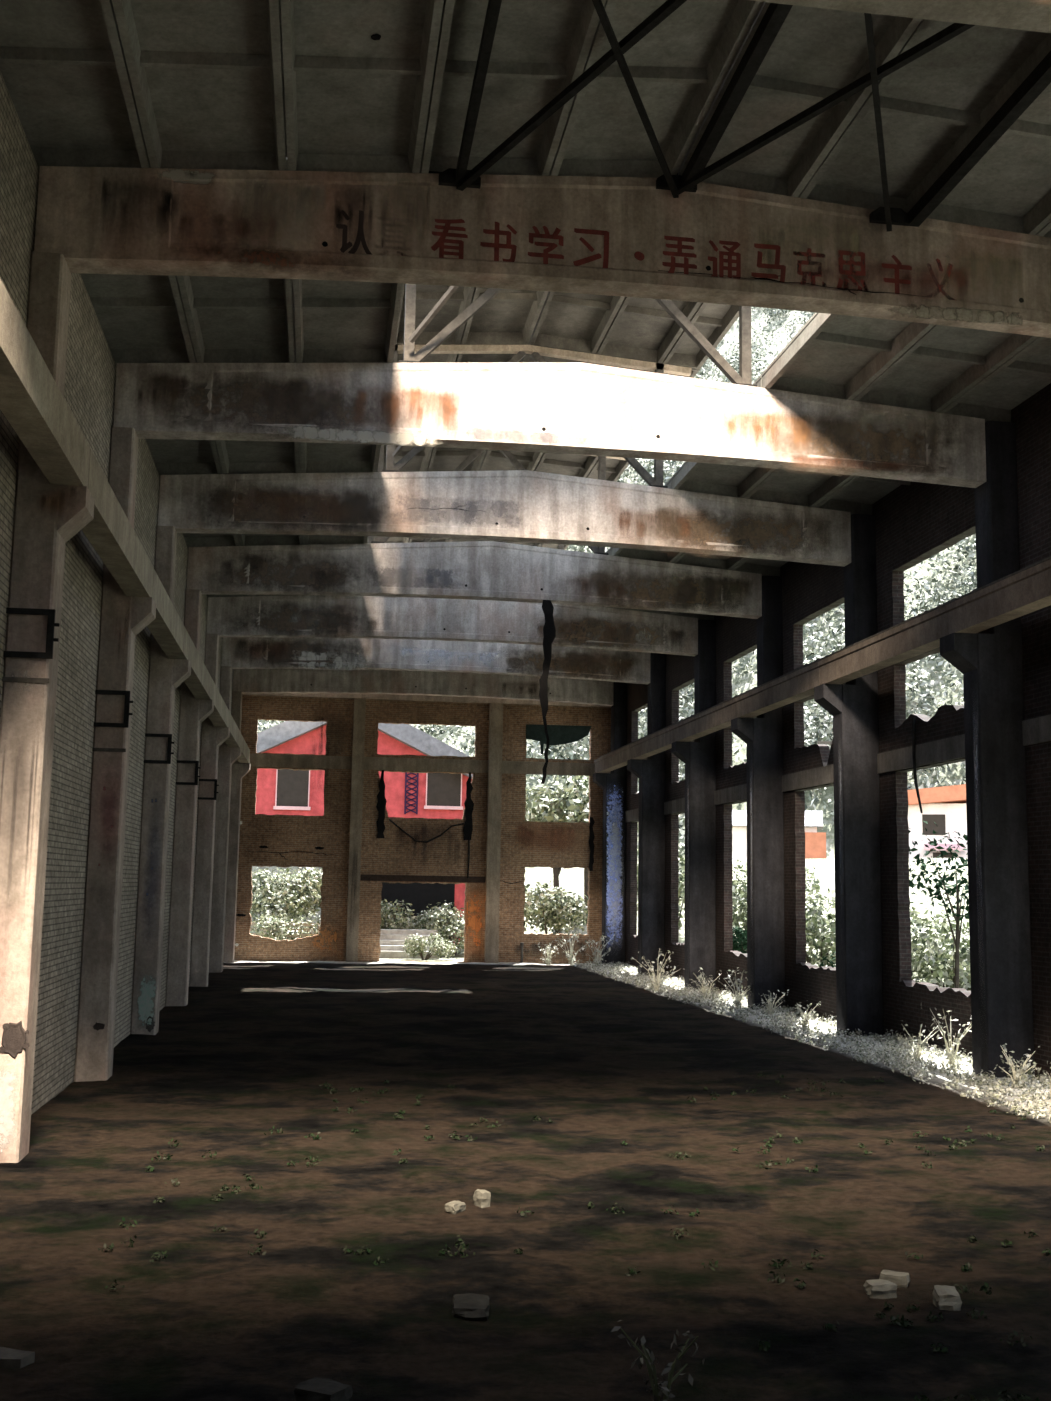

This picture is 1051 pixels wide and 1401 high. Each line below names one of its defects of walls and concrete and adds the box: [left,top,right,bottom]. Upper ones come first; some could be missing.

rust [357,391,456,418]